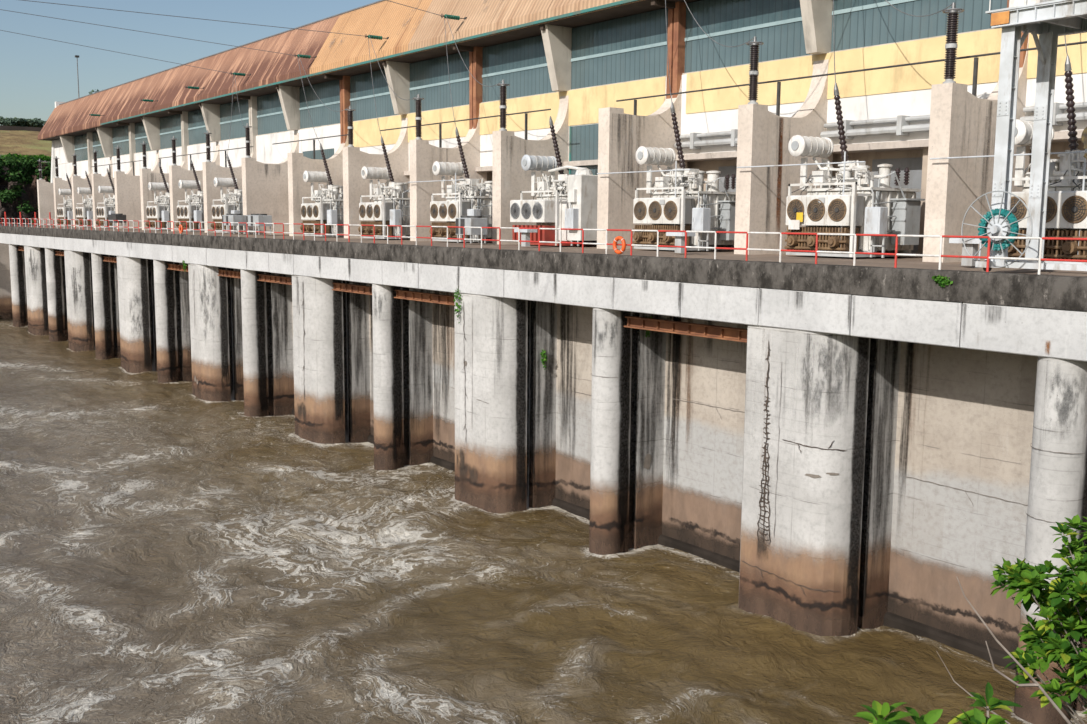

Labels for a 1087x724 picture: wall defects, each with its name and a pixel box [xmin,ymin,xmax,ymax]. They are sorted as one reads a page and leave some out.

leakage [0,245,1087,724]
crack [671,340,846,597]